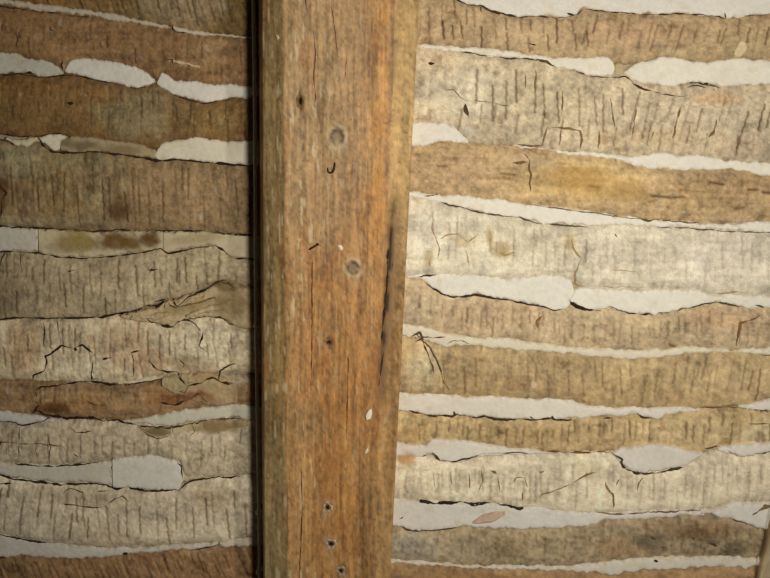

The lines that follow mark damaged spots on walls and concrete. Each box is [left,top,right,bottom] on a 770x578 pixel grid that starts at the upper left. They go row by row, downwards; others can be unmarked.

peeling [460,0,770,19]
peeling [0,52,259,103]
peeling [417,40,770,87]
peeling [6,134,259,166]
peeling [513,145,770,176]
peeling [409,191,770,233]
peeling [0,226,260,259]
peeling [405,273,770,316]
crack [0,280,241,508]
peeling [399,380,700,420]
peeling [0,454,214,490]
peeling [393,498,770,532]